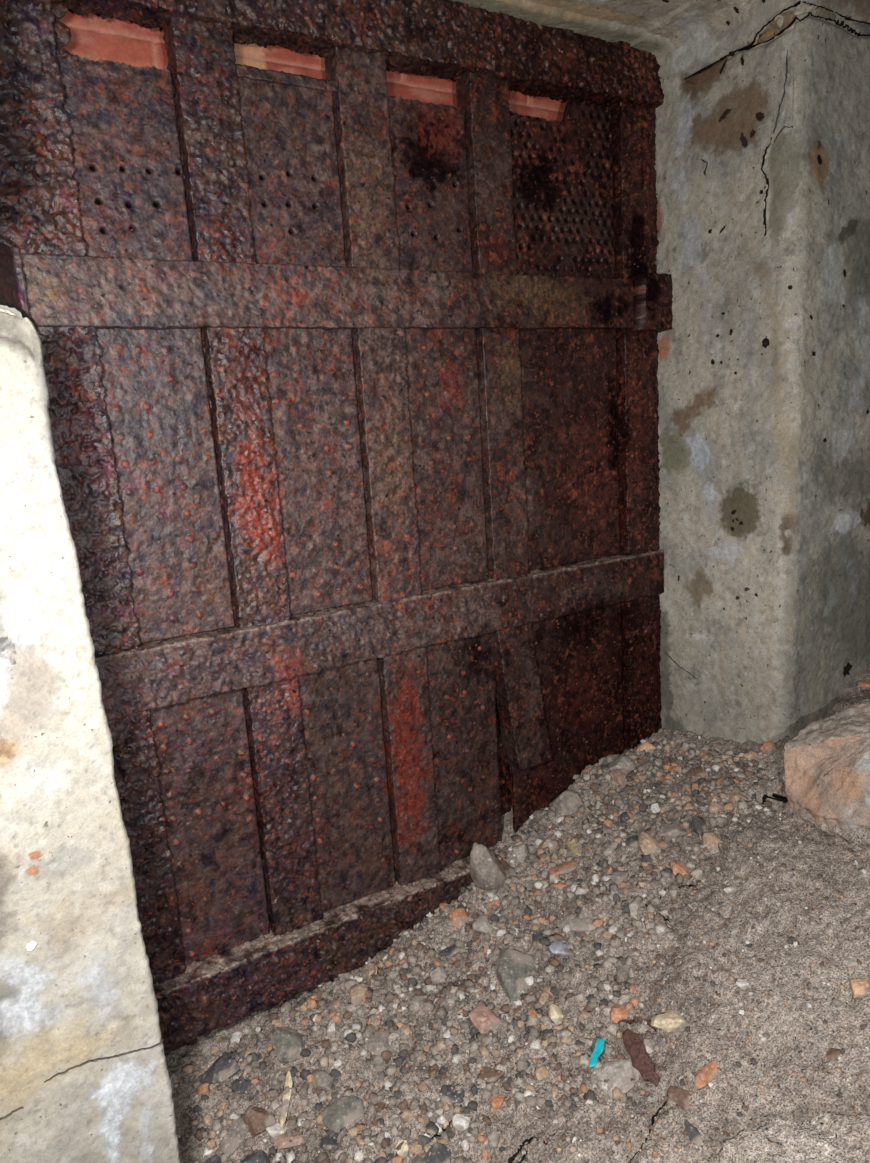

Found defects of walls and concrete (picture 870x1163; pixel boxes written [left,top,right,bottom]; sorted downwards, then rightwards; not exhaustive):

corrosion [497,0,641,24]
crack [684,1,870,239]
leakage [660,431,713,470]
leakage [703,483,760,562]
corrosion [0,739,16,763]
corrosion [26,851,41,875]
crack [44,1039,164,1082]
leakage [92,1061,156,1163]